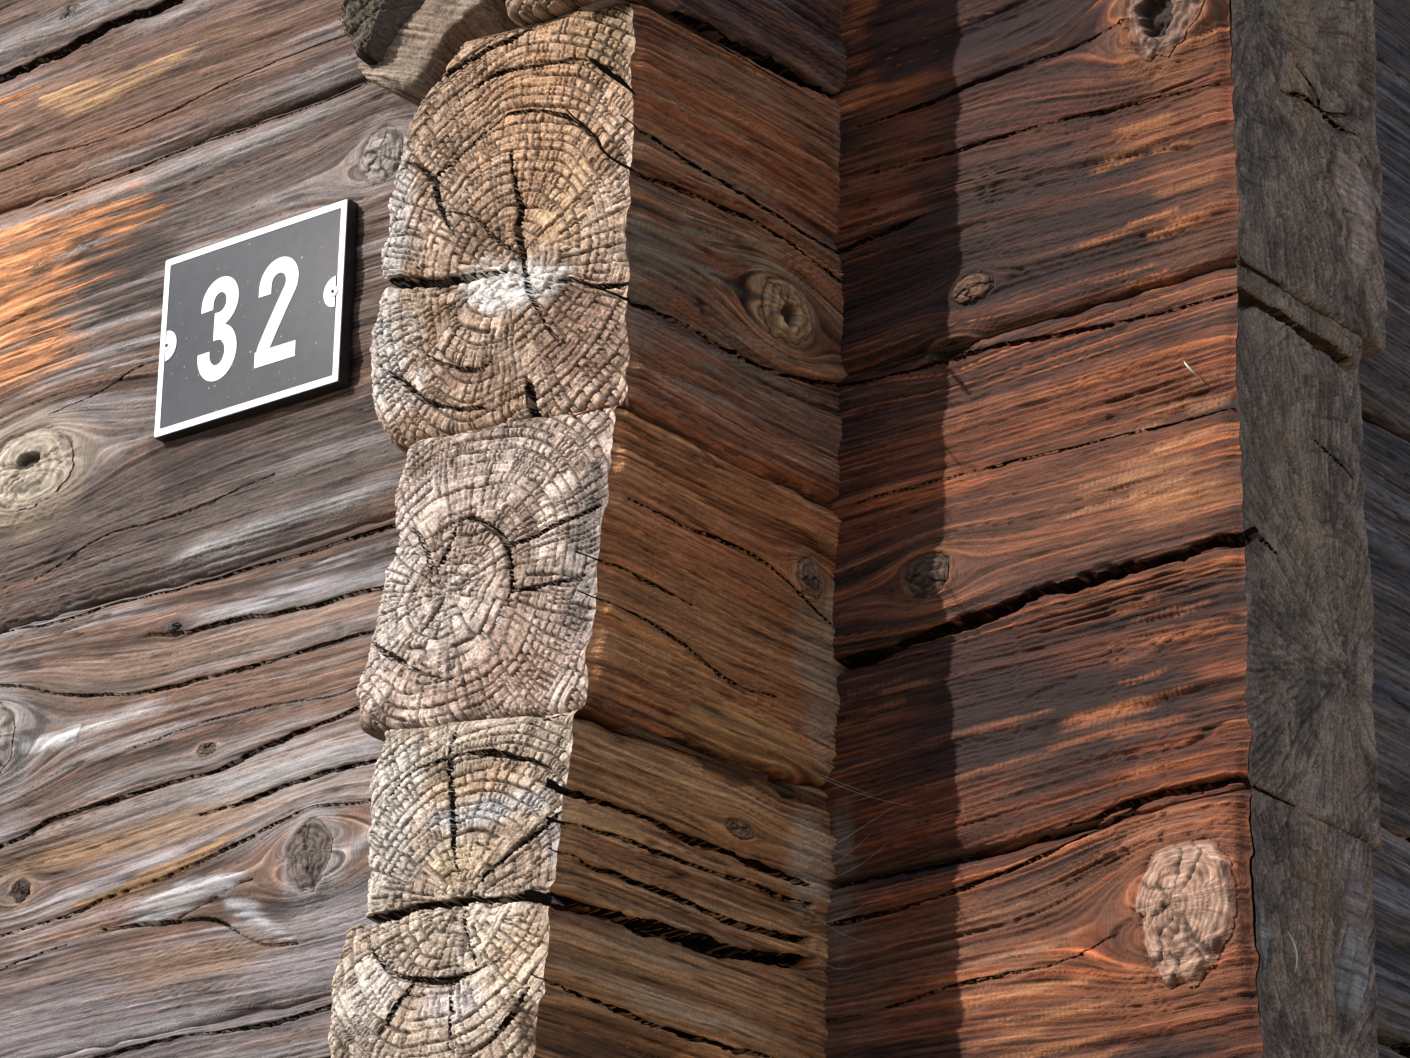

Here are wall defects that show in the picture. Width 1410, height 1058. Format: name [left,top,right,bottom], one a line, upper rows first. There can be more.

crack [0,0,184,83]
crack [389,17,1357,388]
crack [0,497,1279,698]
crack [0,686,1274,1058]